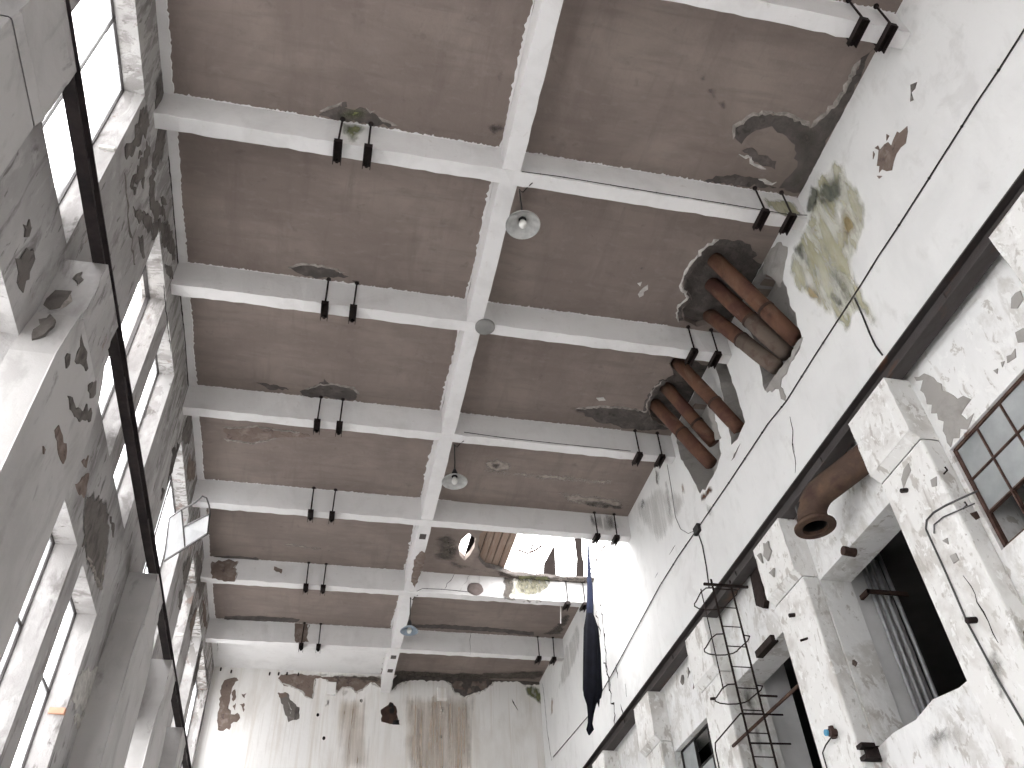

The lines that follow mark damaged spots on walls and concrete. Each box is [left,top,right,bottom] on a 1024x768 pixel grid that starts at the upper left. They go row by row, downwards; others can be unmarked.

peeling [124,73,176,279]
flaking render [705,51,871,193]
peeling [873,127,908,179]
mould [768,163,869,327]
peeling [32,272,83,341]
peeling [65,335,97,422]
peeling [914,373,974,447]
peeling [75,455,115,590]
peeling [178,551,259,686]
leakage [503,575,550,603]
peeling [198,677,246,736]
flaking render [278,674,540,725]